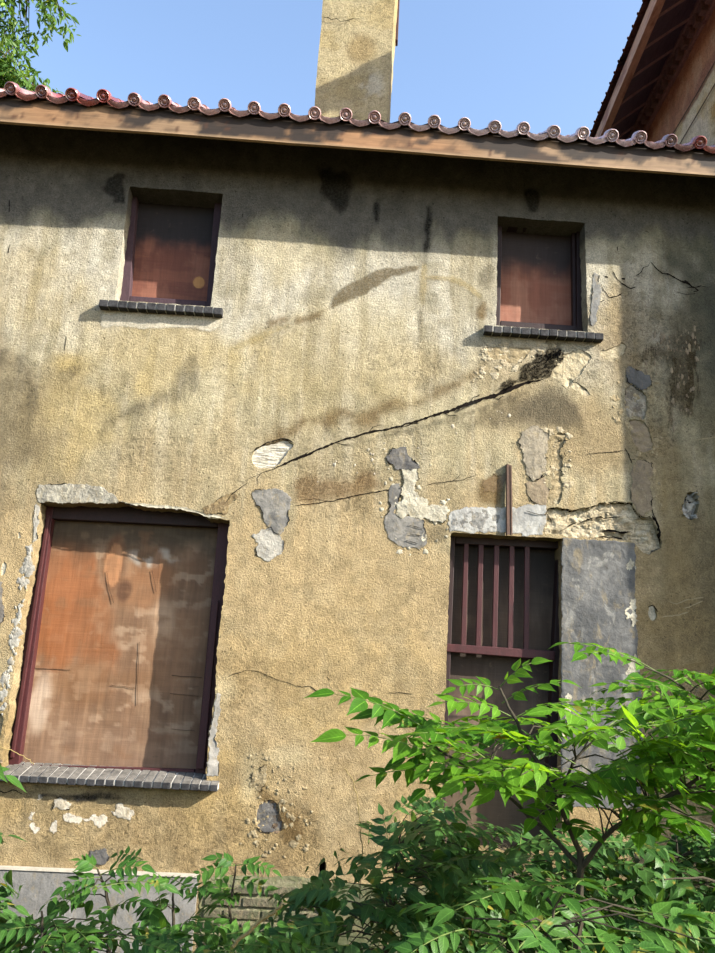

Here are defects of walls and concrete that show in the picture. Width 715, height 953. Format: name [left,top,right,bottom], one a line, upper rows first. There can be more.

water stain [424,207,432,249]
water stain [332,266,418,307]
crack [589,247,708,326]
efflorescence [101,312,221,331]
flaking render [252,438,293,469]
crack [226,378,545,549]
flaking render [541,325,700,554]
flaking render [129,493,240,519]
peeling [625,598,658,627]
flaking render [0,533,35,735]
peeling [625,654,640,675]
flaking render [239,753,313,858]